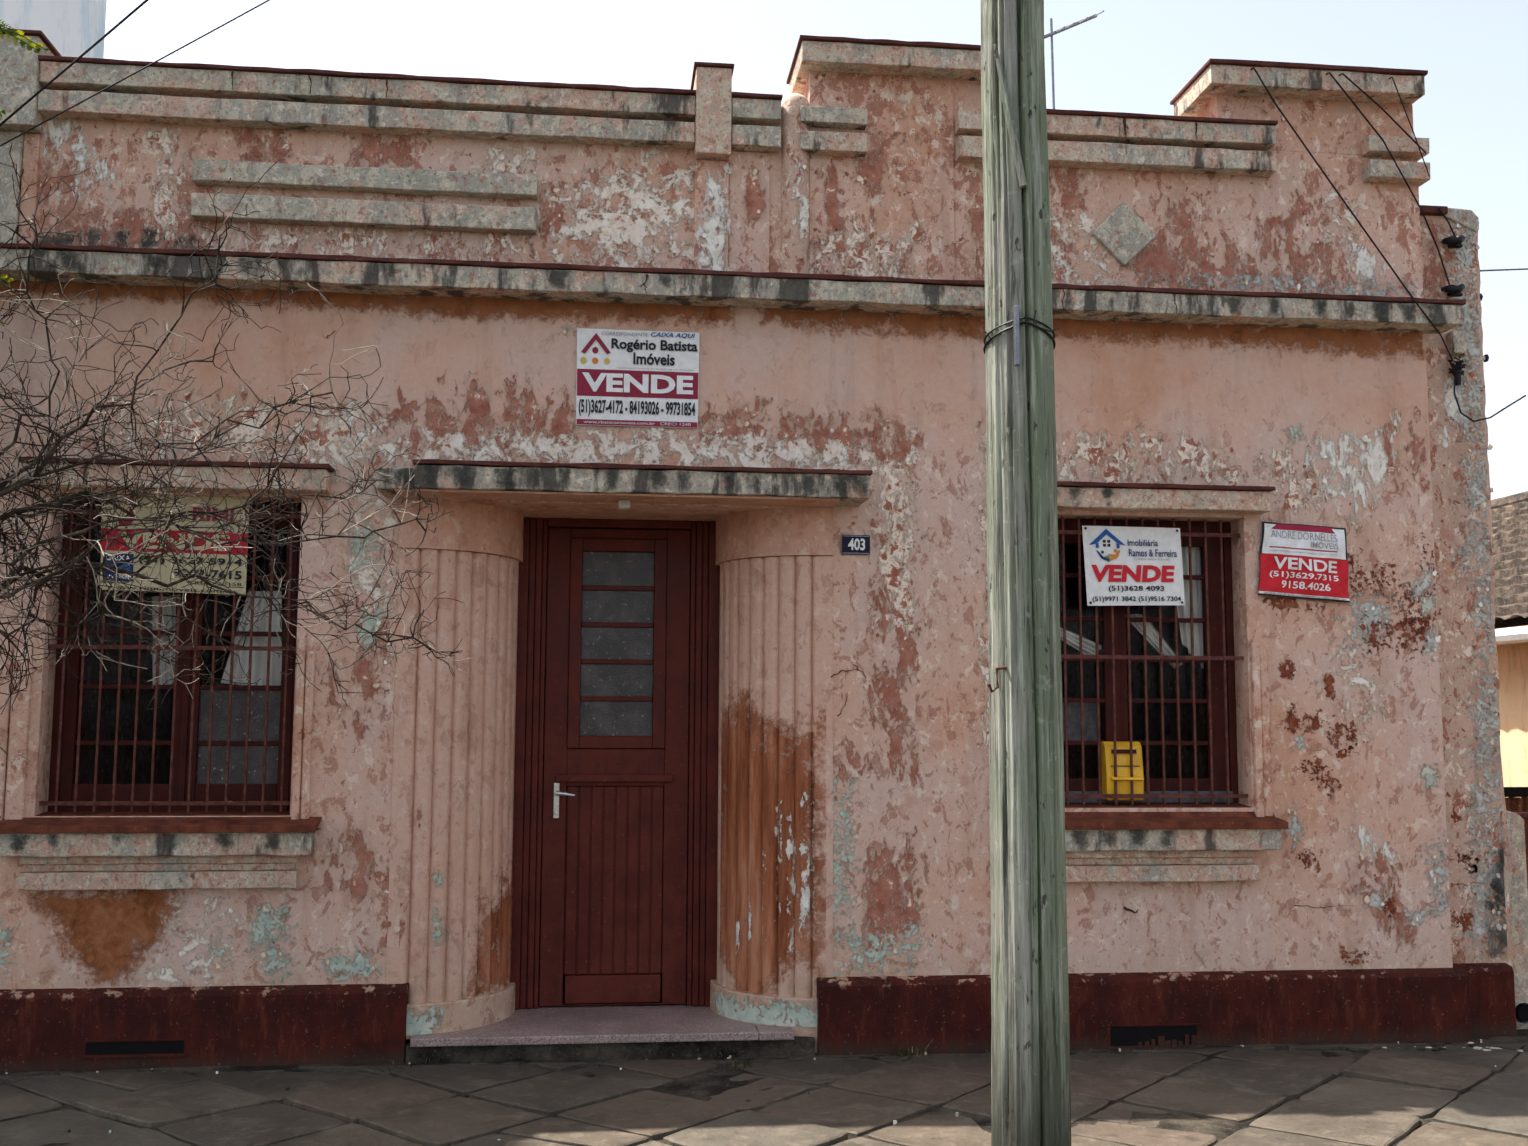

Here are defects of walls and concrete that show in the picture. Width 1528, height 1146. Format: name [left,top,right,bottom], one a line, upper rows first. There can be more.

peeling [36,118,771,271]
peeling [785,113,935,279]